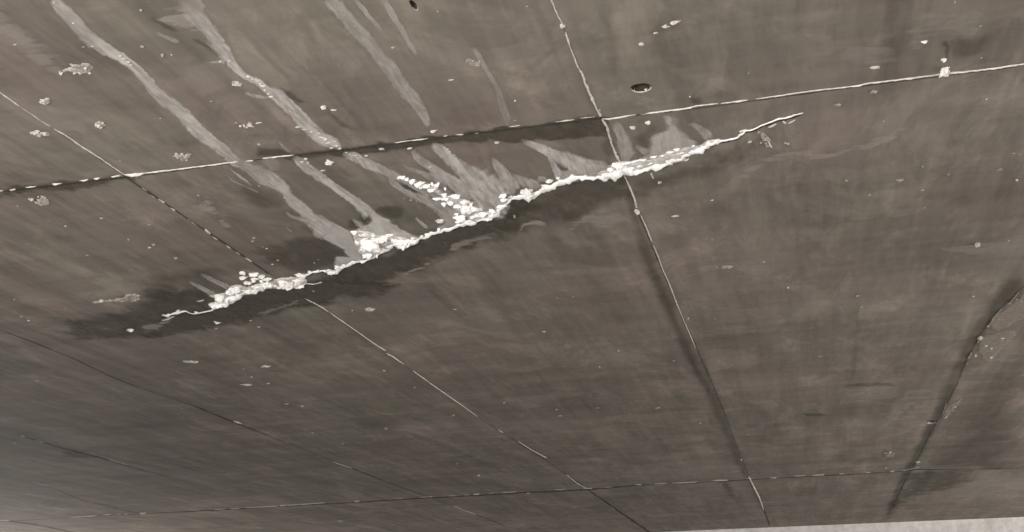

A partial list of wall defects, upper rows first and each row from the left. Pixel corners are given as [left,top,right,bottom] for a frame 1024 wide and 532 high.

leakage [70,21,720,338]
crack [162,113,803,321]